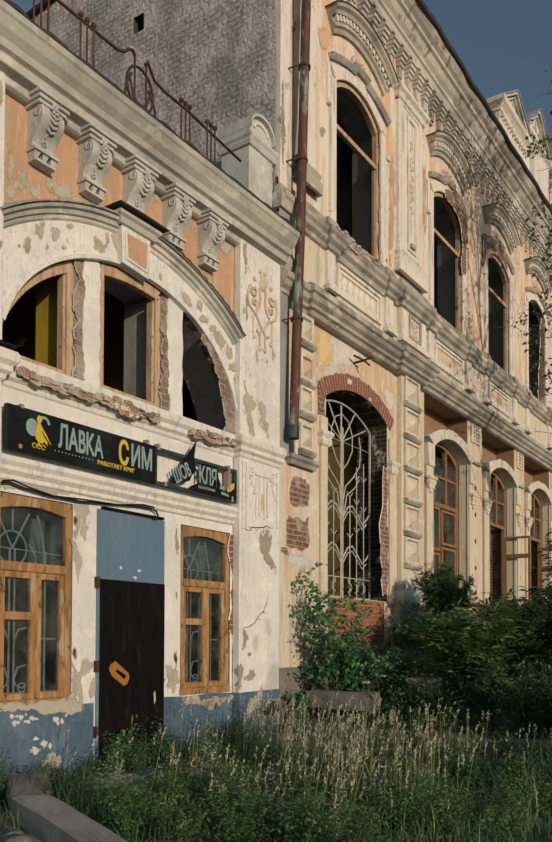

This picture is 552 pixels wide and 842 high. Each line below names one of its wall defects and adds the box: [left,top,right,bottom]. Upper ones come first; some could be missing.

peeling [6,143,83,201]
peeling [18,221,74,253]
peeling [93,233,117,253]
flaking render [17,259,170,424]
flaking render [181,290,269,447]
flaking render [259,476,316,571]
flaking render [164,533,256,710]
flaking render [0,655,96,727]
flaking render [246,686,280,720]